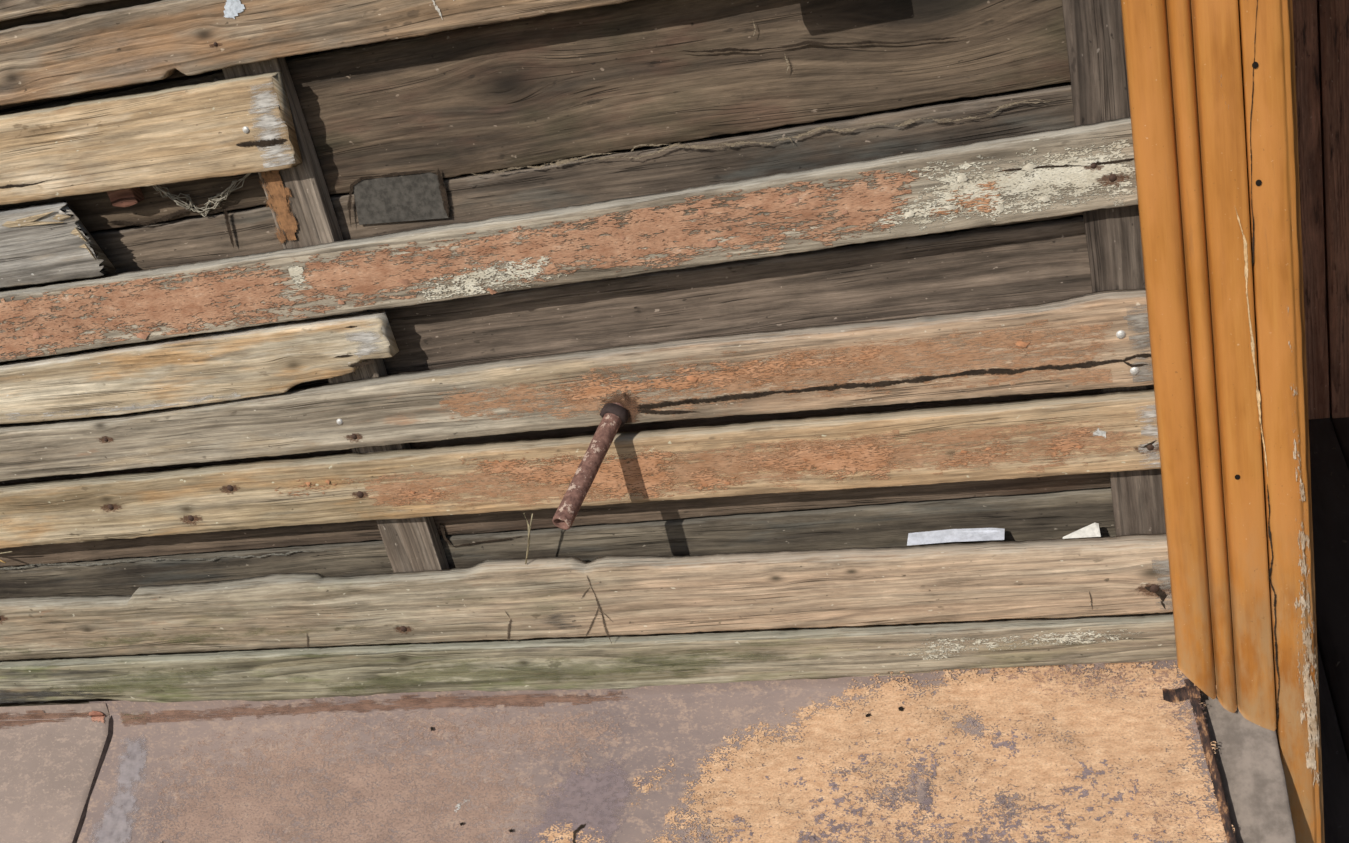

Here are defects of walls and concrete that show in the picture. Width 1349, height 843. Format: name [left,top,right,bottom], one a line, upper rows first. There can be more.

crack [997,158,1134,172]
crack [1250,0,1258,266]
peeling [0,137,1135,360]
peeling [440,320,1113,420]
crack [624,353,1151,415]